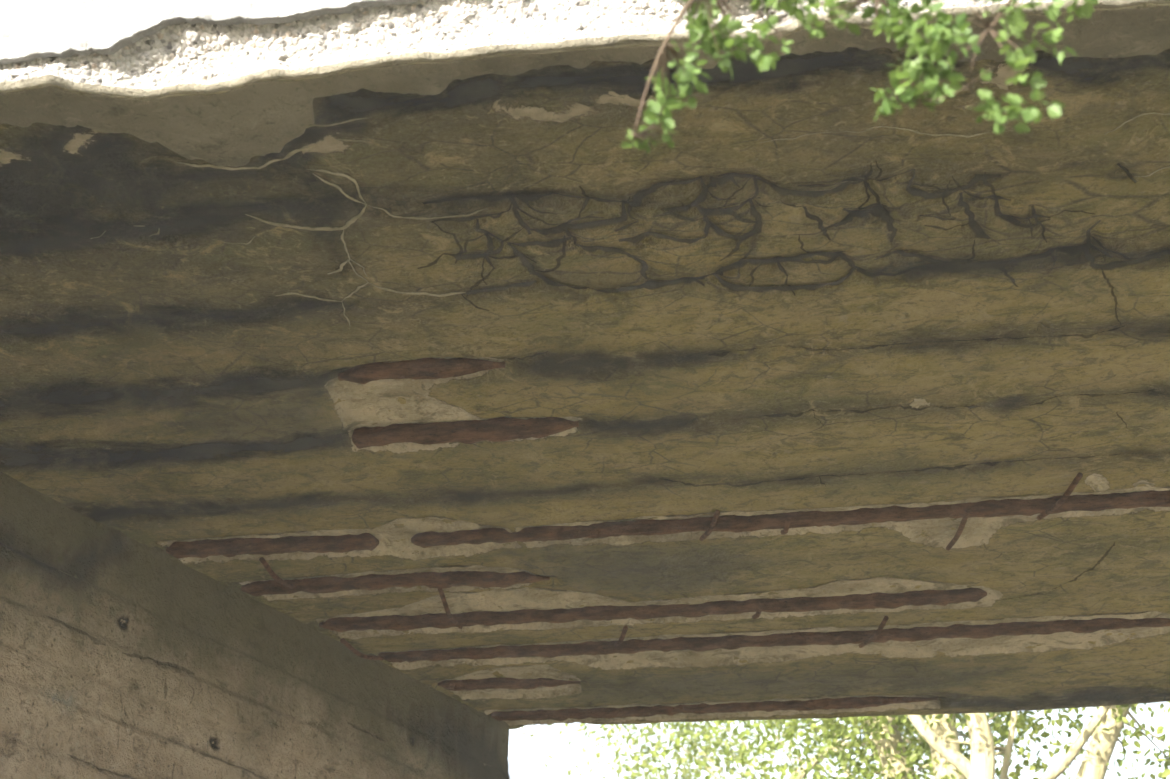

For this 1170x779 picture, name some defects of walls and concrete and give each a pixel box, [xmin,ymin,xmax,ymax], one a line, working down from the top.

flaking render [0,0,1170,167]
water stain [1012,49,1170,85]
water stain [0,47,993,256]
crack [245,161,1170,357]
water stain [0,367,339,421]
water stain [0,432,347,471]
corrosion [338,358,505,384]
spalling [324,357,582,454]
corrosion [352,417,579,449]
corrosion [411,472,1170,551]
spalling [157,473,1170,727]
corrosion [166,533,1170,663]